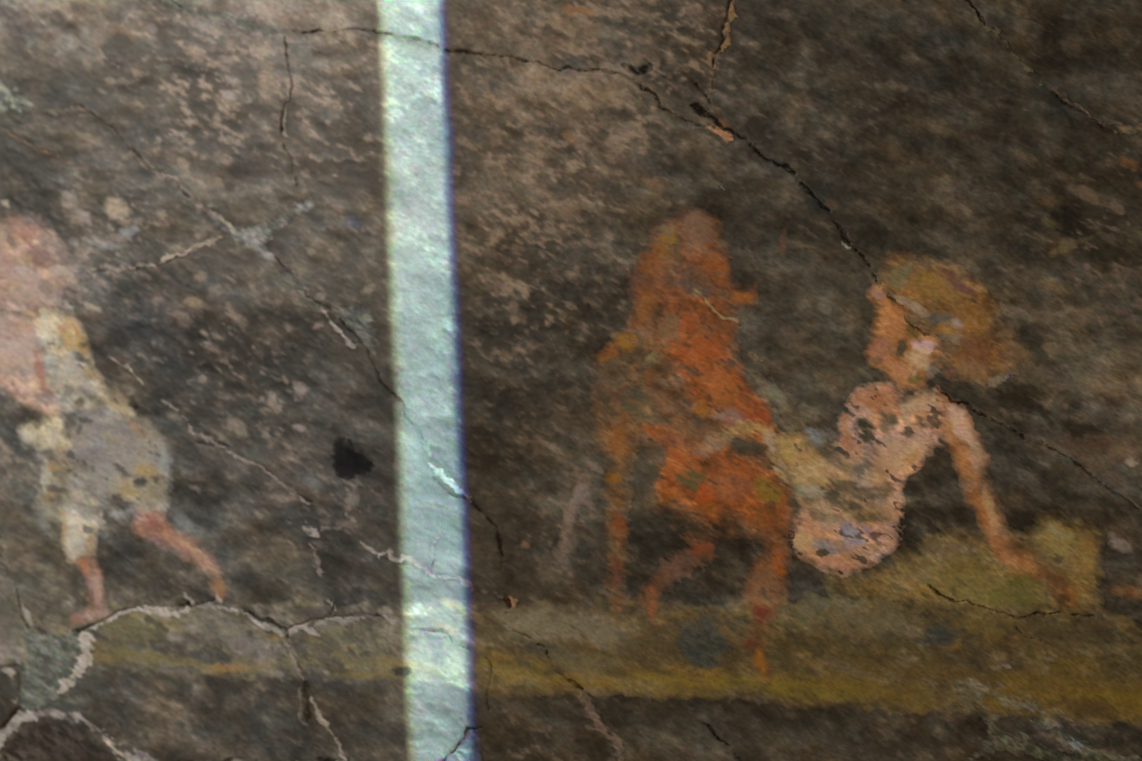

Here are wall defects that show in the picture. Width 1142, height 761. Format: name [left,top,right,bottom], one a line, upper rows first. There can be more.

crack [25,101,237,275]
crack [280,0,930,336]
crack [107,355,313,505]
crack [274,257,504,563]
crack [938,388,1142,511]
crack [0,655,26,730]
flaking render [56,627,96,694]
flaking render [0,706,158,761]
crack [71,592,493,761]
crack [359,529,633,761]
crack [928,585,1095,642]
flaking render [1068,736,1085,752]